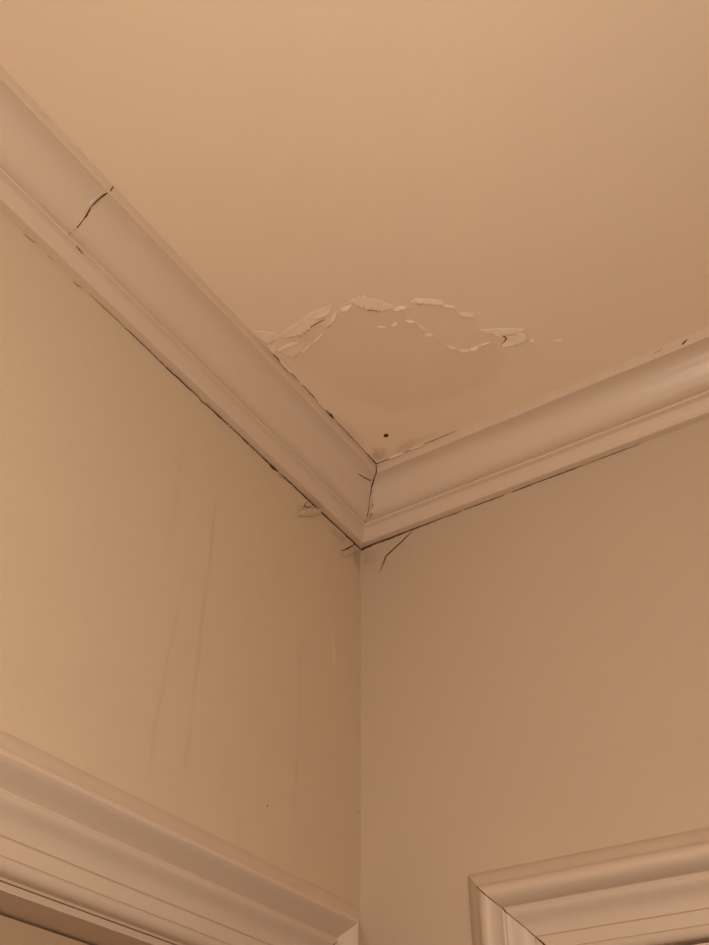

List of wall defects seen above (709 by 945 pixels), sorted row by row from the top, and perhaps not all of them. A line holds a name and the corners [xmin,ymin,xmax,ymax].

crack [69,186,114,234]
crack [74,282,639,570]